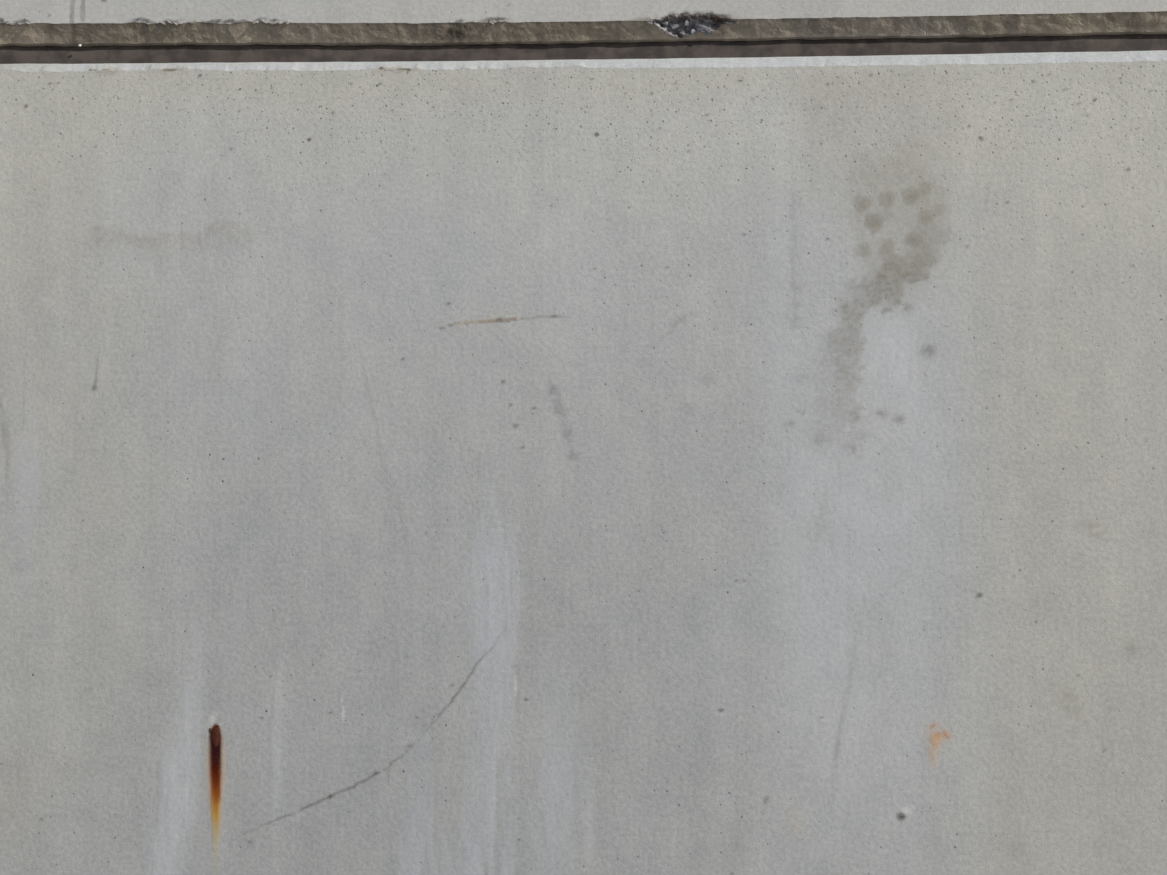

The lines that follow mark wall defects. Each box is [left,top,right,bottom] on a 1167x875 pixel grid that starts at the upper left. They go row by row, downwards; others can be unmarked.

spalling [647,13,738,39]
corrosion [209,725,222,824]